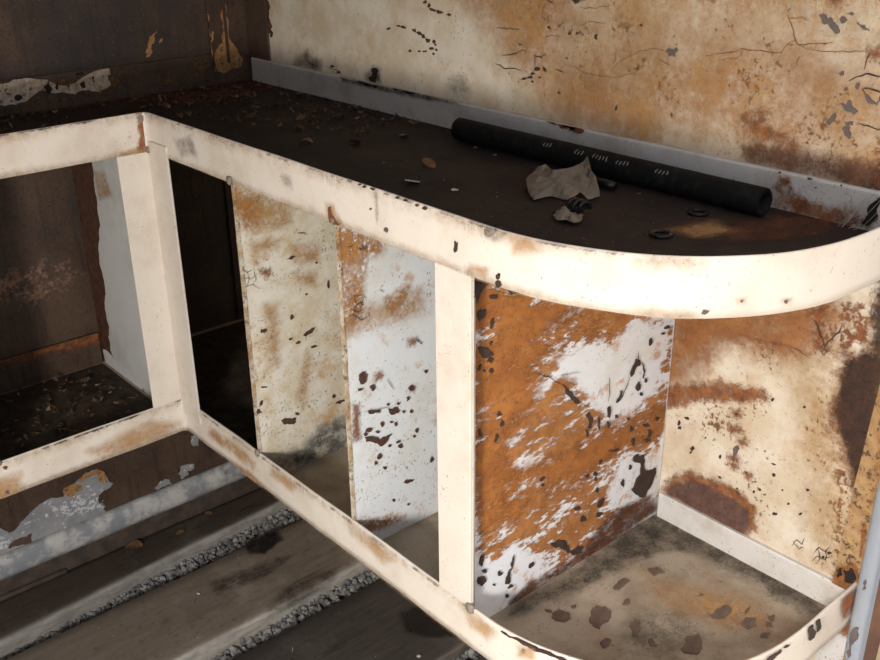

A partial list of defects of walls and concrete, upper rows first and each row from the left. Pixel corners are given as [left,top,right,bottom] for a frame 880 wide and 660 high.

peeling [207,4,243,73]
peeling [0,68,111,106]
corrosion [490,0,880,228]
corrosion [662,280,880,590]
peeling [0,469,113,555]
water stain [401,607,456,637]